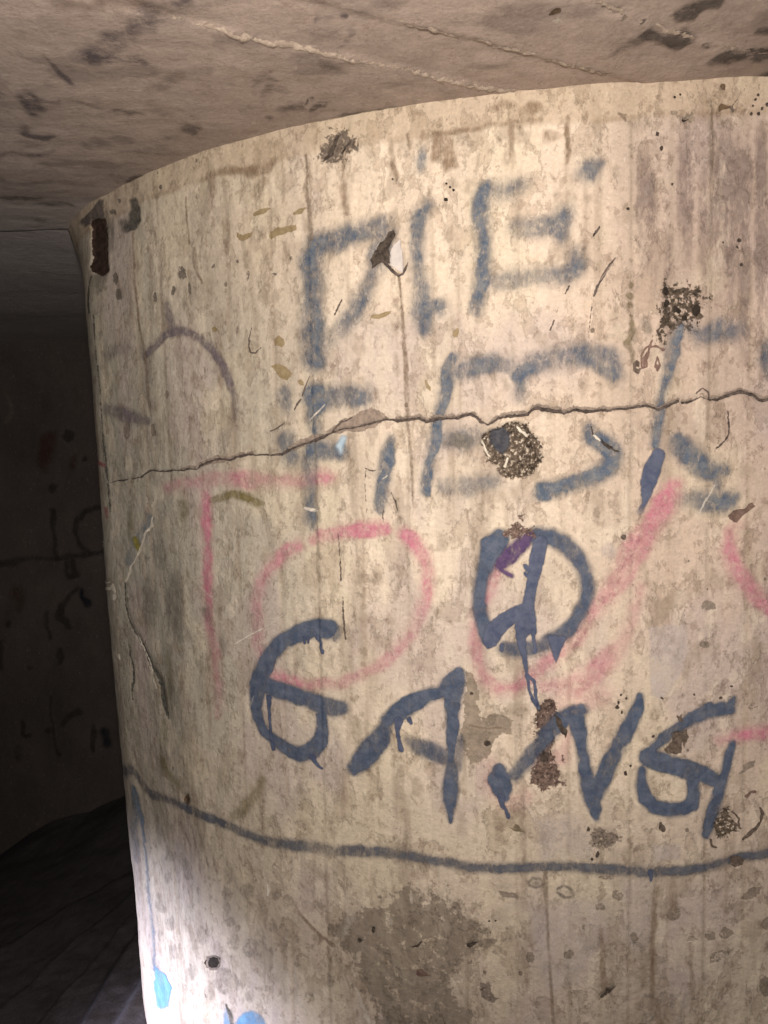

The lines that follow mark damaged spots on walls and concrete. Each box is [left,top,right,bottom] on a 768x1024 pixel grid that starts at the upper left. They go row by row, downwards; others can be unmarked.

spalling [313,127,361,167]
spalling [81,198,141,300]
spalling [171,266,191,295]
spalling [370,230,408,277]
spalling [633,276,713,374]
crack [87,258,768,519]
spalling [450,421,544,479]
crack [124,516,169,719]
spalling [530,699,568,791]
spalling [587,827,622,861]
spalling [710,806,765,848]
leakage [480,982,499,1003]